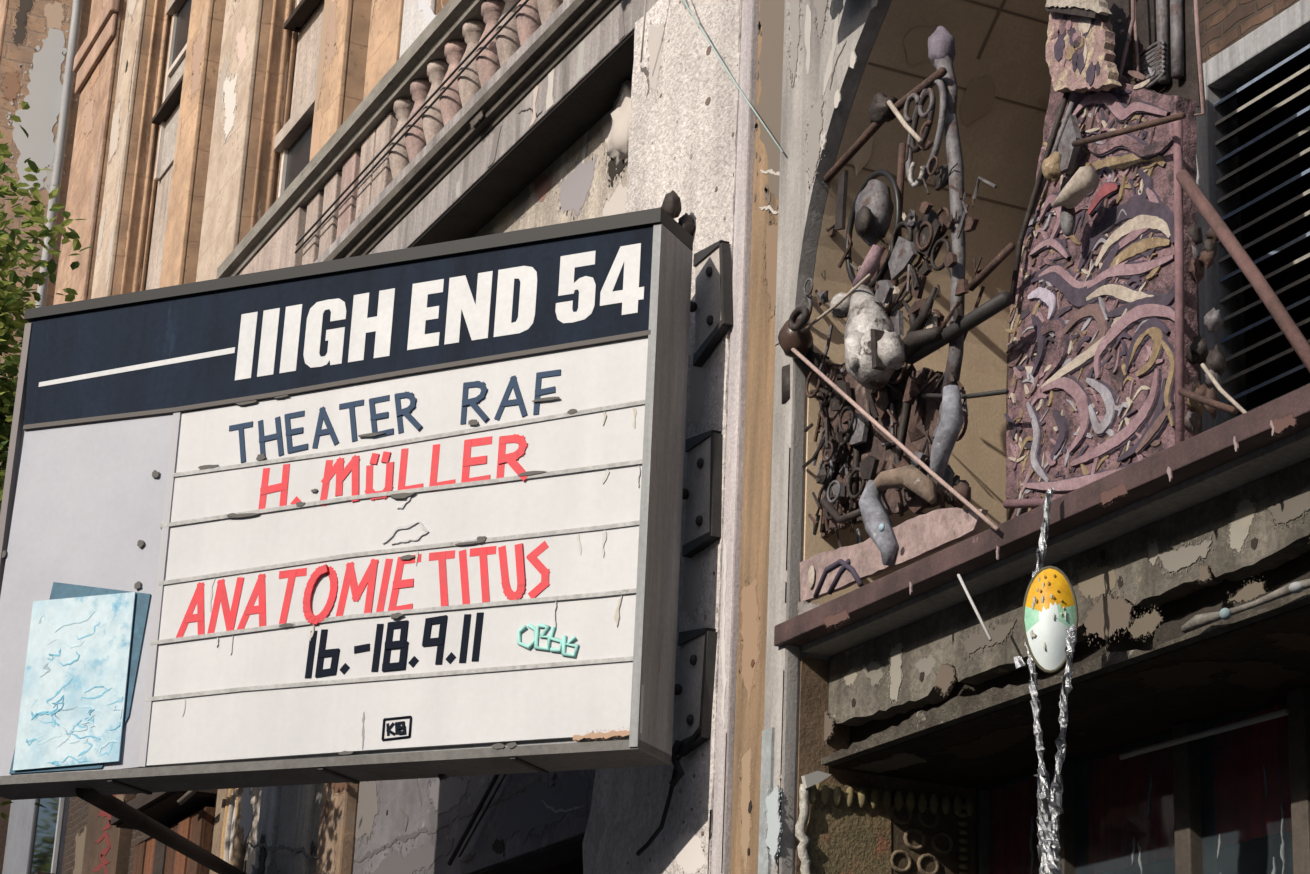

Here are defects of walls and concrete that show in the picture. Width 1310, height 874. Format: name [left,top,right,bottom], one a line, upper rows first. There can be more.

peeling [0,0,101,207]
spalling [1235,492,1273,550]
spalling [1074,551,1163,649]
spalling [1197,563,1212,582]
flaking render [1227,580,1266,605]
spalling [843,669,858,707]
spalling [919,662,957,698]
crack [353,779,448,863]
crack [705,810,713,874]